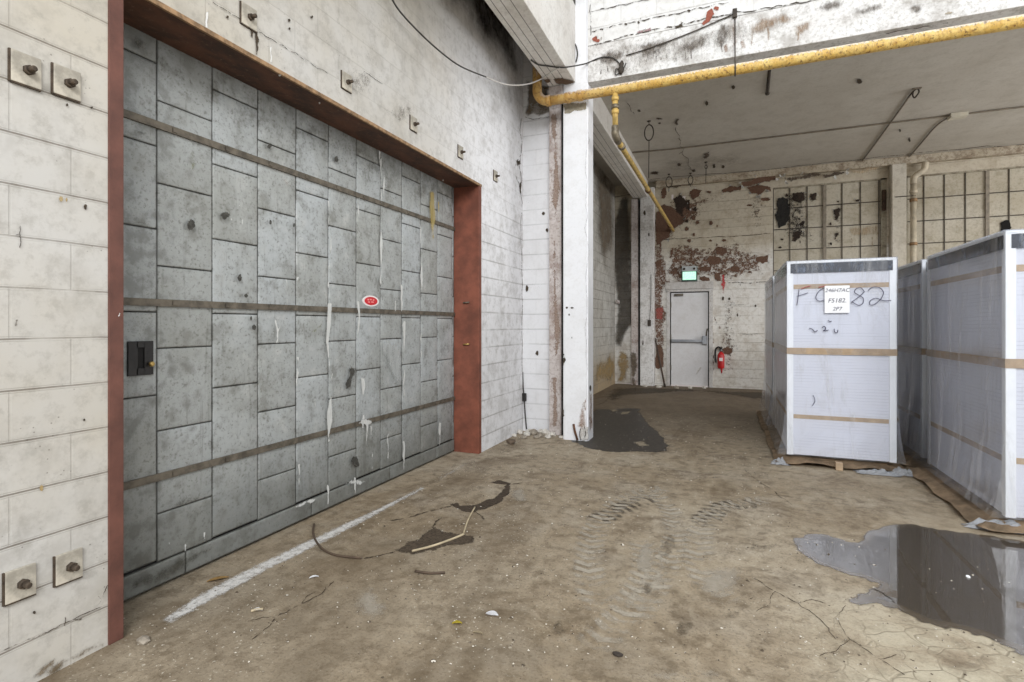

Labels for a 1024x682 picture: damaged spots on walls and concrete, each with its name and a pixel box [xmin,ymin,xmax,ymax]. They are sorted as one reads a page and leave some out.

peeling [642,163,849,371]
damp [571,352,765,452]
crack [754,578,914,675]